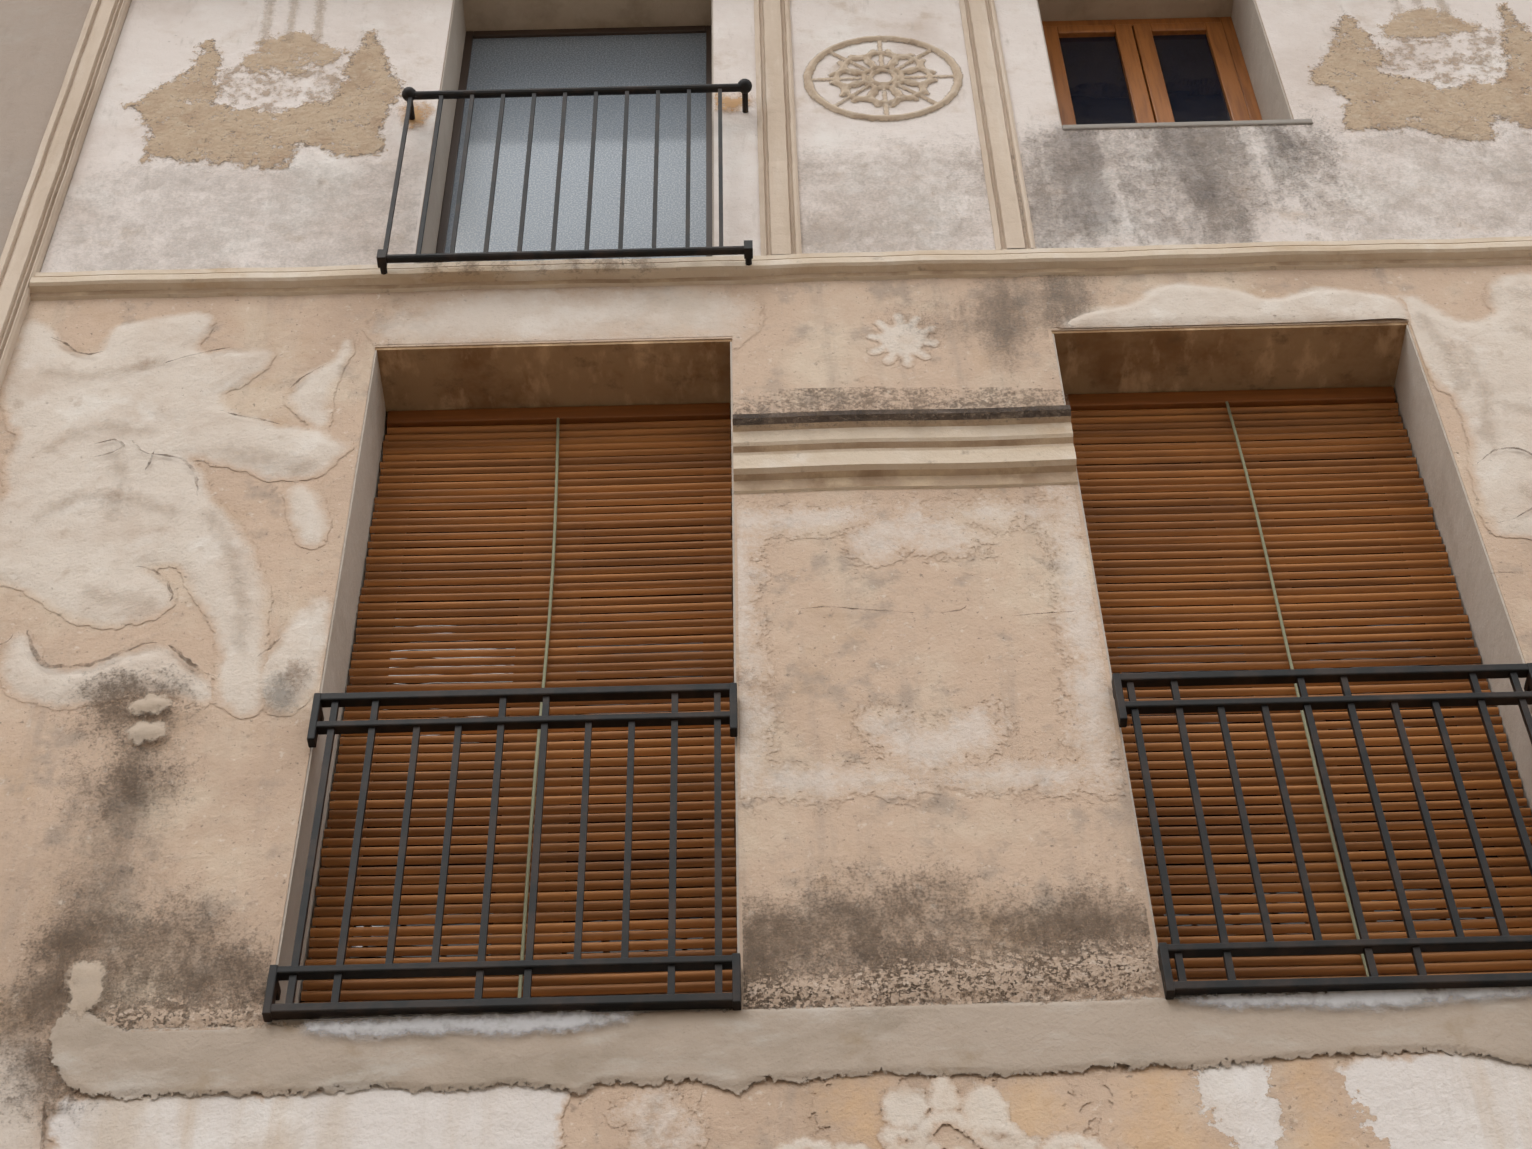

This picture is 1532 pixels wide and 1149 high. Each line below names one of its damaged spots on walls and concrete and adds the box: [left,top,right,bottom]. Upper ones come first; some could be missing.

peeling [120,28,408,171]
peeling [1308,3,1532,143]
leakage [1114,125,1250,239]
crack [94,439,198,486]
crack [10,631,198,668]
leakage [68,664,197,828]
leakage [0,864,287,1126]
leakage [729,864,1161,1011]